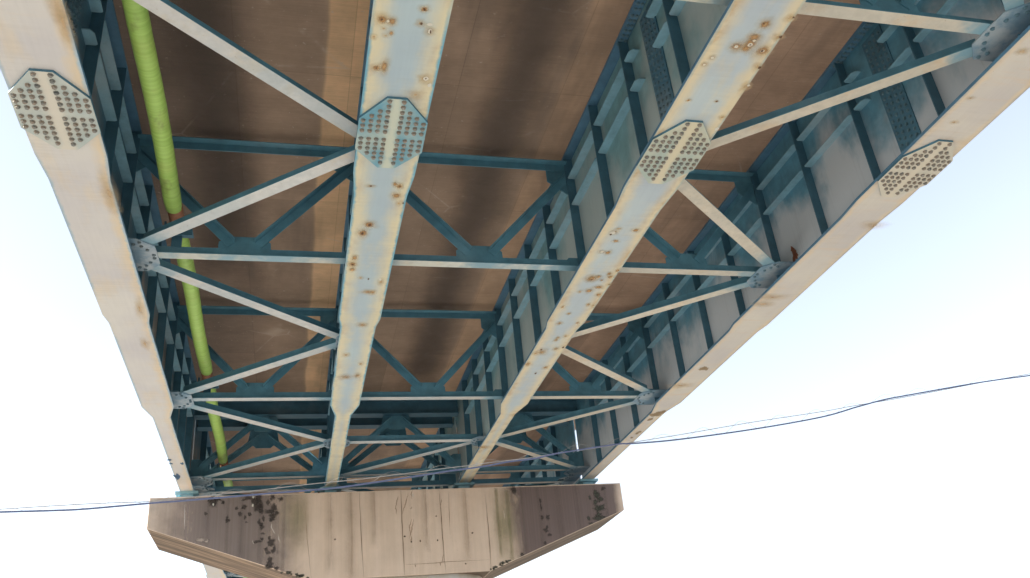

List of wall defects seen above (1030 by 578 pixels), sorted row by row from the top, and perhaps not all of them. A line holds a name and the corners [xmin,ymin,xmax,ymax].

rust [733,22,768,54]